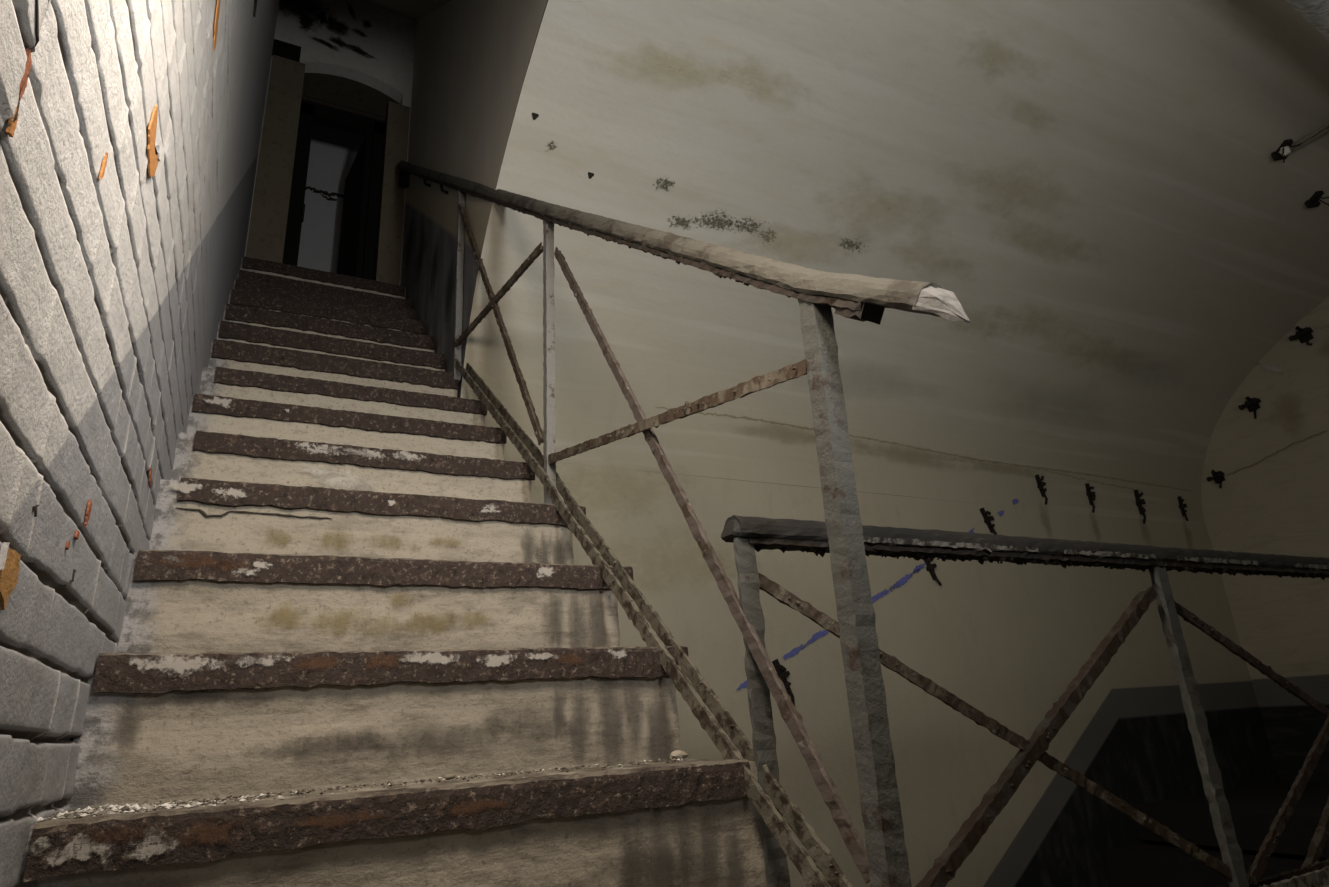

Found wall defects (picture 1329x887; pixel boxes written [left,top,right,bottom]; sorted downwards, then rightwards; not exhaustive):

flaking render [279,0,373,58]
peeling [5,49,32,137]
peeling [98,152,108,179]
peeling [147,105,162,177]
leakage [670,210,776,245]
crack [176,507,332,519]
peeling [0,542,21,610]
leakage [526,540,566,564]
leakage [550,600,604,647]
leakage [603,694,667,762]
leakage [626,822,741,887]